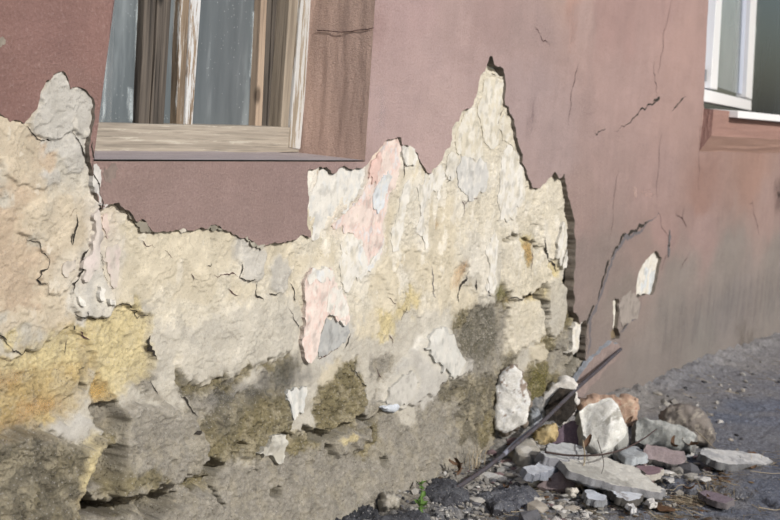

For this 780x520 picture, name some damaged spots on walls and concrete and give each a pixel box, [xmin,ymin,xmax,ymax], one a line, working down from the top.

crack [596,5,686,136]
spalling [0,66,583,520]
crack [577,170,689,354]
spalling [636,252,658,295]